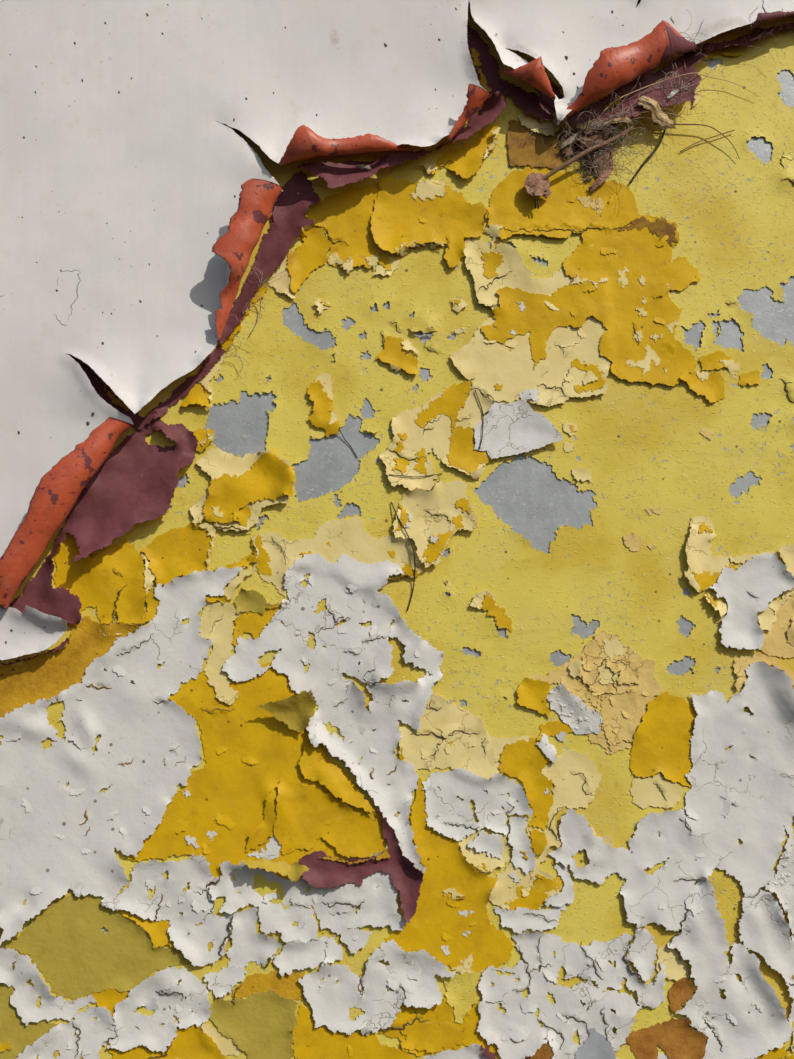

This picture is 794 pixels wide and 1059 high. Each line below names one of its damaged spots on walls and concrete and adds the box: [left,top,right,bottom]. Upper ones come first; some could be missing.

peeling [777,70,794,107]
peeling [0,171,488,1059]
peeling [107,113,794,1059]